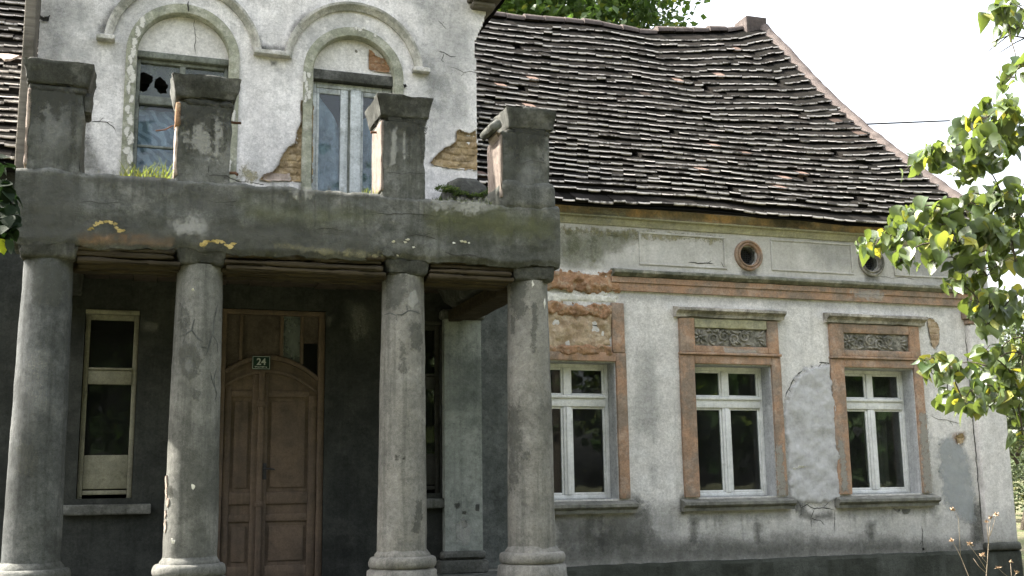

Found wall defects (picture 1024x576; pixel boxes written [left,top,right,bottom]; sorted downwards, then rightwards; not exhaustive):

flaking render [355,25,391,73]
flaking render [259,71,314,183]
flaking render [431,128,503,198]
flaking render [543,269,621,356]
flaking render [927,318,940,349]
flaking render [163,475,175,544]
crack [798,502,835,527]